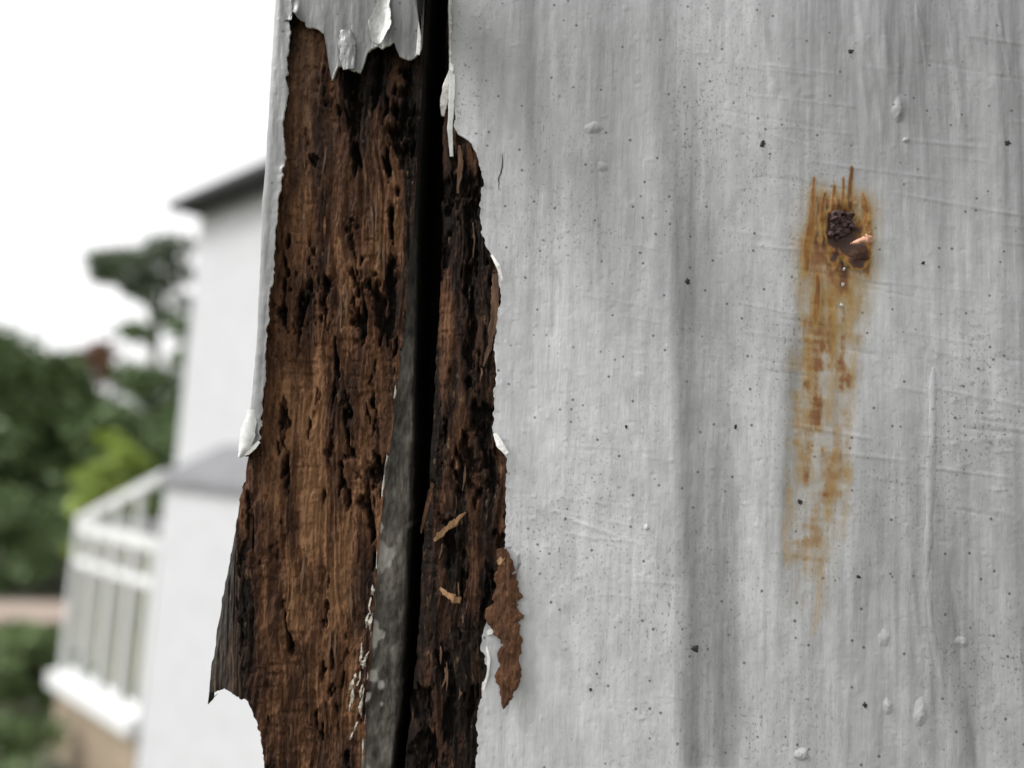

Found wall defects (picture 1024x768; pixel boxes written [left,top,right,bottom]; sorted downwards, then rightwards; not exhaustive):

peeling [338,29,356,70]
peeling [368,0,391,45]
peeling [440,0,455,157]
crack [426,0,448,493]
rust [795,166,873,502]
peeling [238,409,260,458]
peeling [493,433,508,455]
peeling [483,546,525,709]